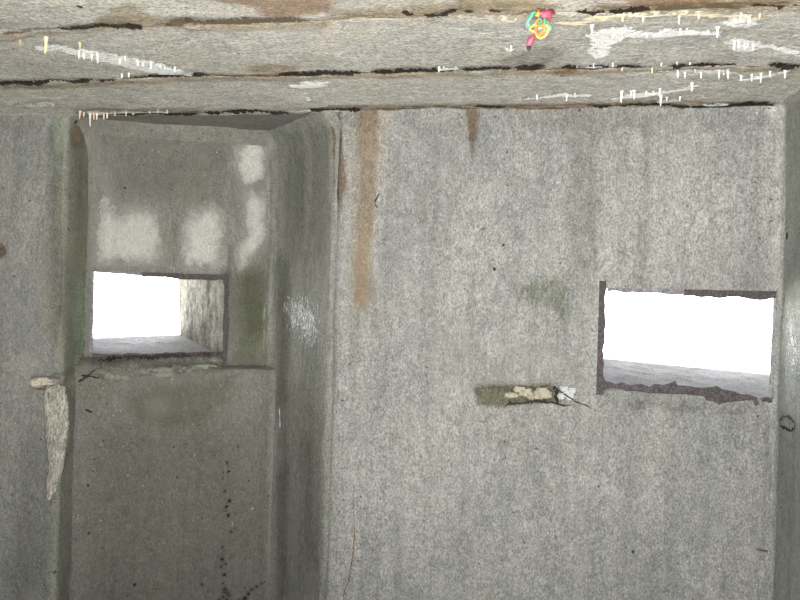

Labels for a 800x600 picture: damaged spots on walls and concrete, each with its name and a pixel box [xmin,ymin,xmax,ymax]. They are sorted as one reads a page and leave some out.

efflorescence [34,36,194,78]
efflorescence [555,10,800,71]
efflorescence [79,109,170,126]
rust [466,108,477,155]
efflorescence [506,93,593,102]
efflorescence [612,62,790,106]
water stain [95,196,162,265]
water stain [180,207,224,268]
water stain [237,145,266,269]
efflorescence [284,289,319,346]
spalling [476,384,590,408]